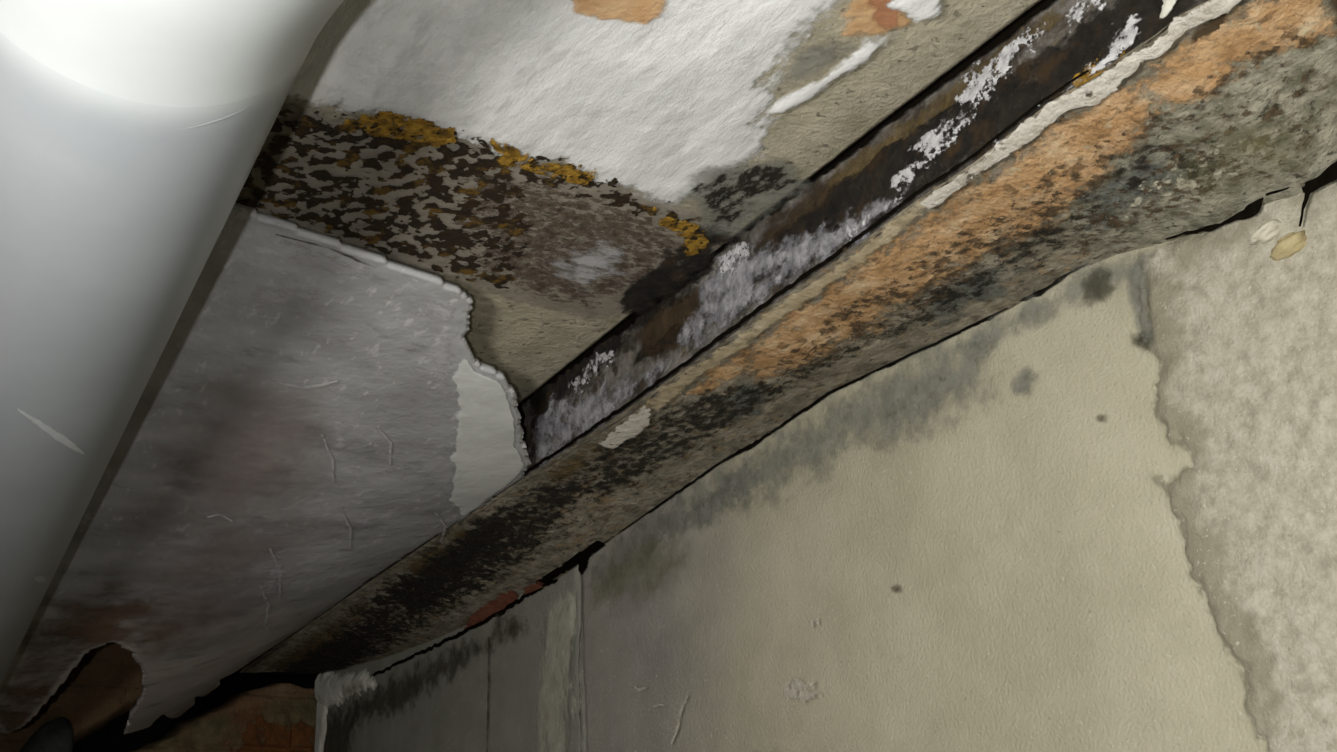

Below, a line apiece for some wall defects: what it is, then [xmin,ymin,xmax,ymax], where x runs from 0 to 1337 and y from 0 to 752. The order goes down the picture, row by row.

water stain [236,0,1196,428]
corrosion [686,0,1335,394]
crack [1166,161,1337,240]
water stain [263,69,1324,752]
crack [603,263,1089,544]
crack [370,573,583,752]
spalling [464,541,605,629]